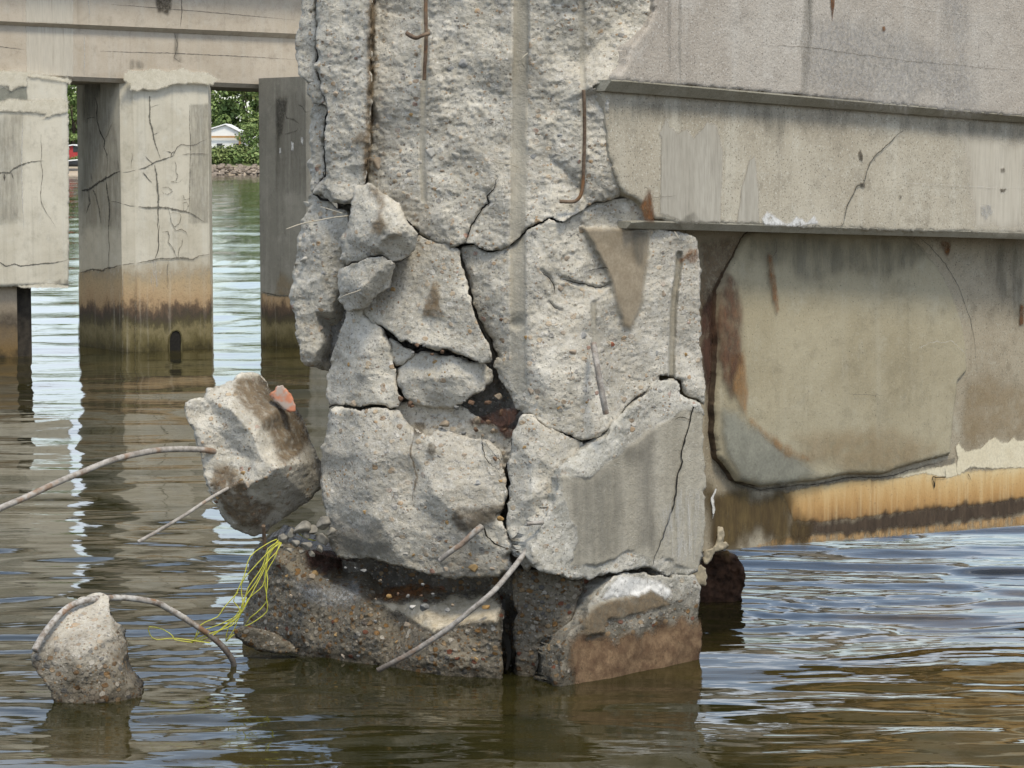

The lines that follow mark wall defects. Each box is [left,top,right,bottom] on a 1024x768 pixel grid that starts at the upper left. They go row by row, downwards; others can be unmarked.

spalling [405,0,430,80]
crack [0,97,209,273]
spalling [559,90,586,204]
damp [19,266,213,352]
crack [329,179,607,409]
rust [701,276,747,409]
rust [470,408,517,439]
crack [481,436,512,549]
crack [653,407,694,564]
damp [786,468,1024,543]
peeling [891,437,1024,478]
spalling [376,548,526,673]